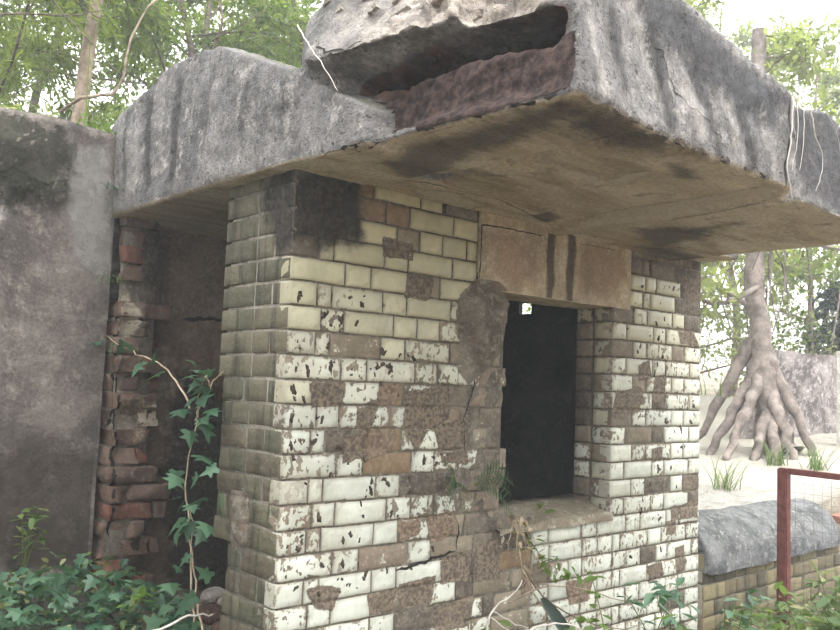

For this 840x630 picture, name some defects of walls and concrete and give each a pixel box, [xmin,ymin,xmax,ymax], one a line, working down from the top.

spalling [376,30,577,135]
damp [263,169,364,251]
damp [547,234,555,298]
damp [565,234,576,302]
damp [642,226,721,260]
crack [183,315,222,323]
peeling [290,360,360,424]
peeling [335,347,469,472]
crack [454,372,475,454]
peeling [293,558,368,611]
crack [396,519,460,571]
peeling [367,511,500,630]